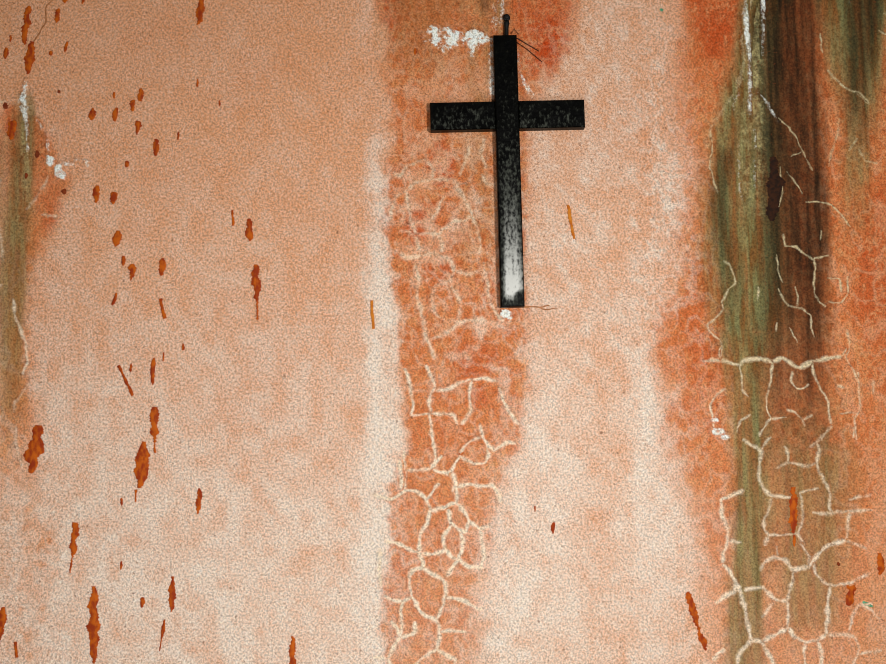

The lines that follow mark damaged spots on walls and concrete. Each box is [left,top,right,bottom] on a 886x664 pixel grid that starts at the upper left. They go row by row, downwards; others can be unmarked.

leakage [12,76,91,231]
leakage [418,0,507,102]
leakage [517,44,536,101]
crack [708,128,719,194]
leakage [729,0,781,222]
crack [778,117,878,227]
crack [818,33,870,105]
rust [0,86,81,664]
crack [372,137,557,664]
leakage [499,308,514,320]
rust [634,0,886,664]
crack [702,230,882,664]